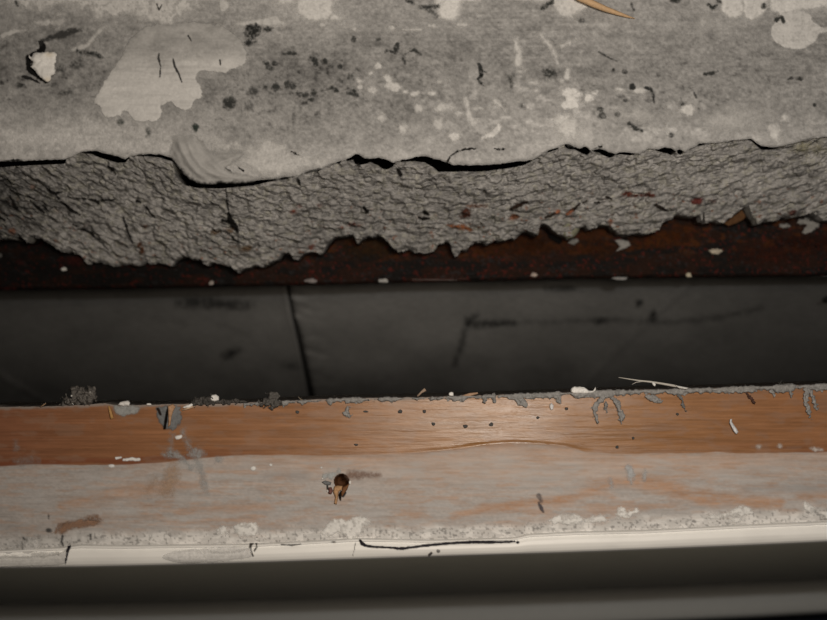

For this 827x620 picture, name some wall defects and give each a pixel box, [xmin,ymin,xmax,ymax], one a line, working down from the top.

crack [548,144,630,157]
crack [657,146,680,154]
crack [0,159,66,167]
crack [89,151,178,175]
crack [0,187,133,250]
crack [195,148,529,243]
spalling [0,137,827,274]
rust [447,206,472,231]
crack [545,196,612,218]
rust [723,210,746,226]